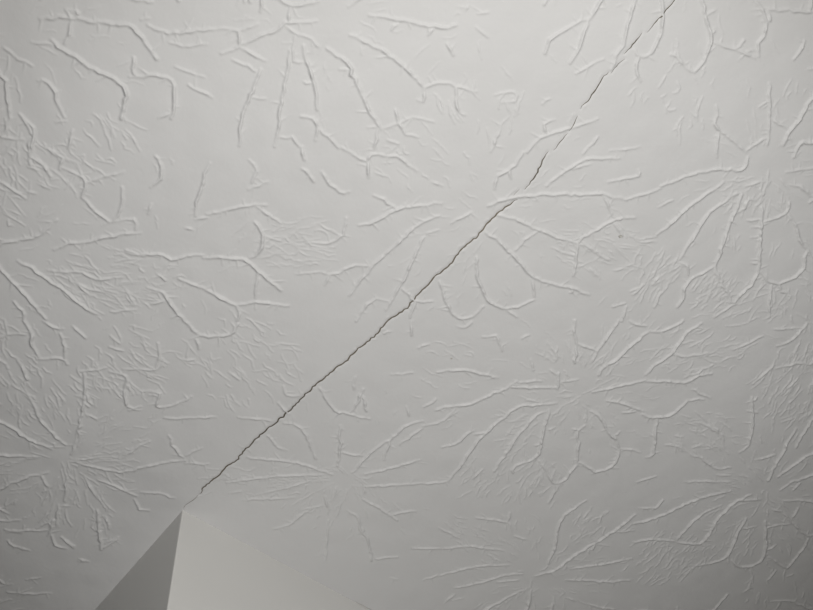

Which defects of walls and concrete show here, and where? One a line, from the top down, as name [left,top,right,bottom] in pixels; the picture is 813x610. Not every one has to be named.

crack [184,0,675,507]